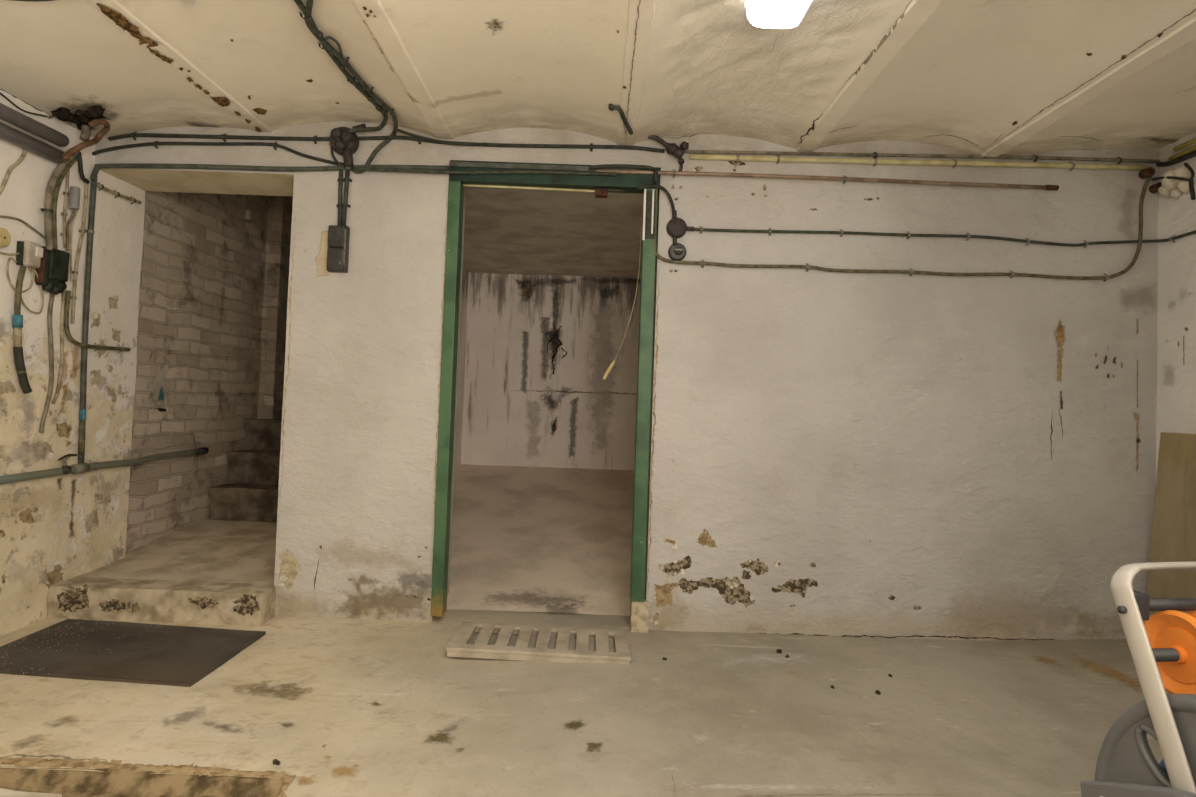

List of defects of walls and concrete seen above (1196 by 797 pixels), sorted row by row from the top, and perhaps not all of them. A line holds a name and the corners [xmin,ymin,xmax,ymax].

spalling [96,3,267,132]
peeling [90,295,121,386]
peeling [0,380,16,394]
rust [1056,321,1064,409]
spalling [22,419,74,462]
spalling [647,269,781,625]
spalling [19,506,44,524]
peeling [83,491,112,533]
spalling [46,564,141,614]
spalling [189,594,260,616]
leakage [346,577,424,615]
spalling [772,563,820,610]